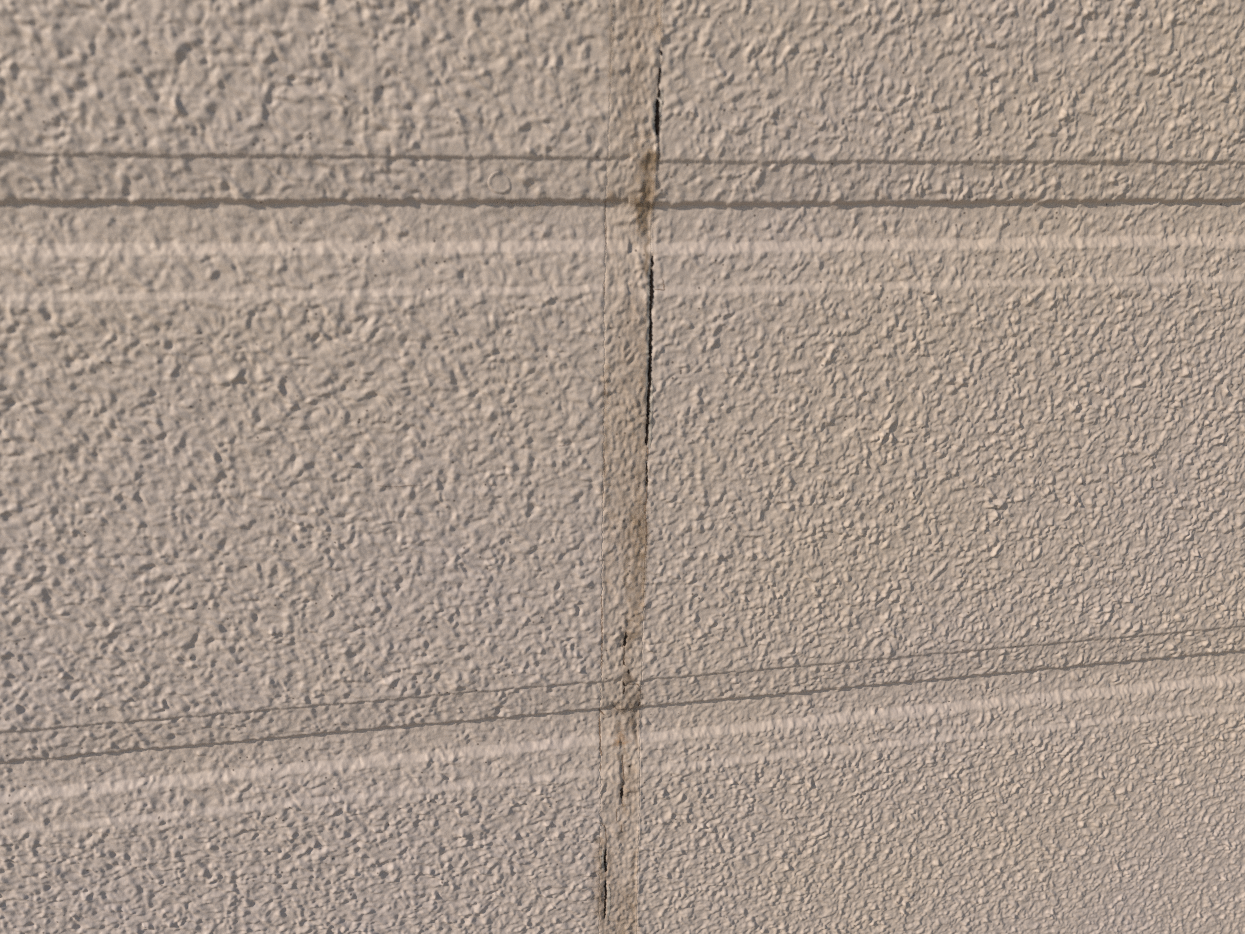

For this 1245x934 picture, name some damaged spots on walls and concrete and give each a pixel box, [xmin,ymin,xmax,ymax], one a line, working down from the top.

crack [651,50,664,170]
crack [644,256,665,558]
crack [598,596,641,921]